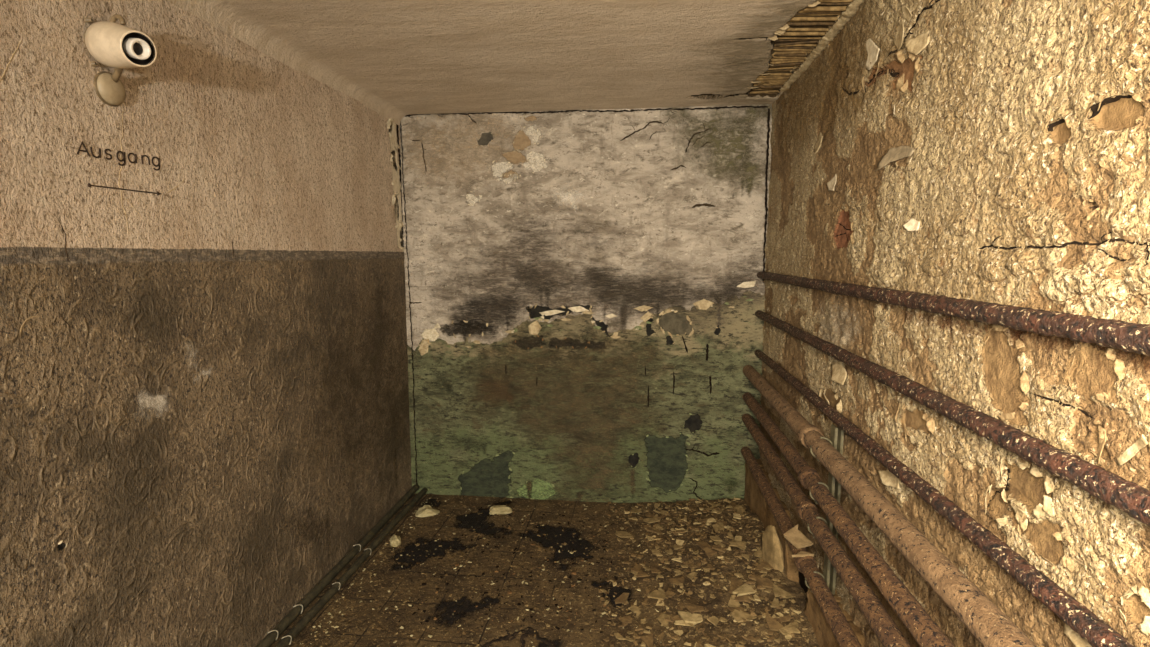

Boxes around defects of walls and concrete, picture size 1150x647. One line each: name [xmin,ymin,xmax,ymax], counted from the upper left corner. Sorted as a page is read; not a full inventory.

crack [842,0,940,95]
flaking render [861,6,930,95]
flaking render [1045,118,1072,147]
flaking render [1085,93,1145,133]
crack [978,230,1150,266]
damp [433,221,763,501]
flaking render [981,324,1031,426]
flaking render [1064,341,1126,405]
peeling [1091,420,1148,467]
flaking render [982,458,1075,573]
peeling [1061,620,1092,647]
flaking render [1119,585,1150,636]